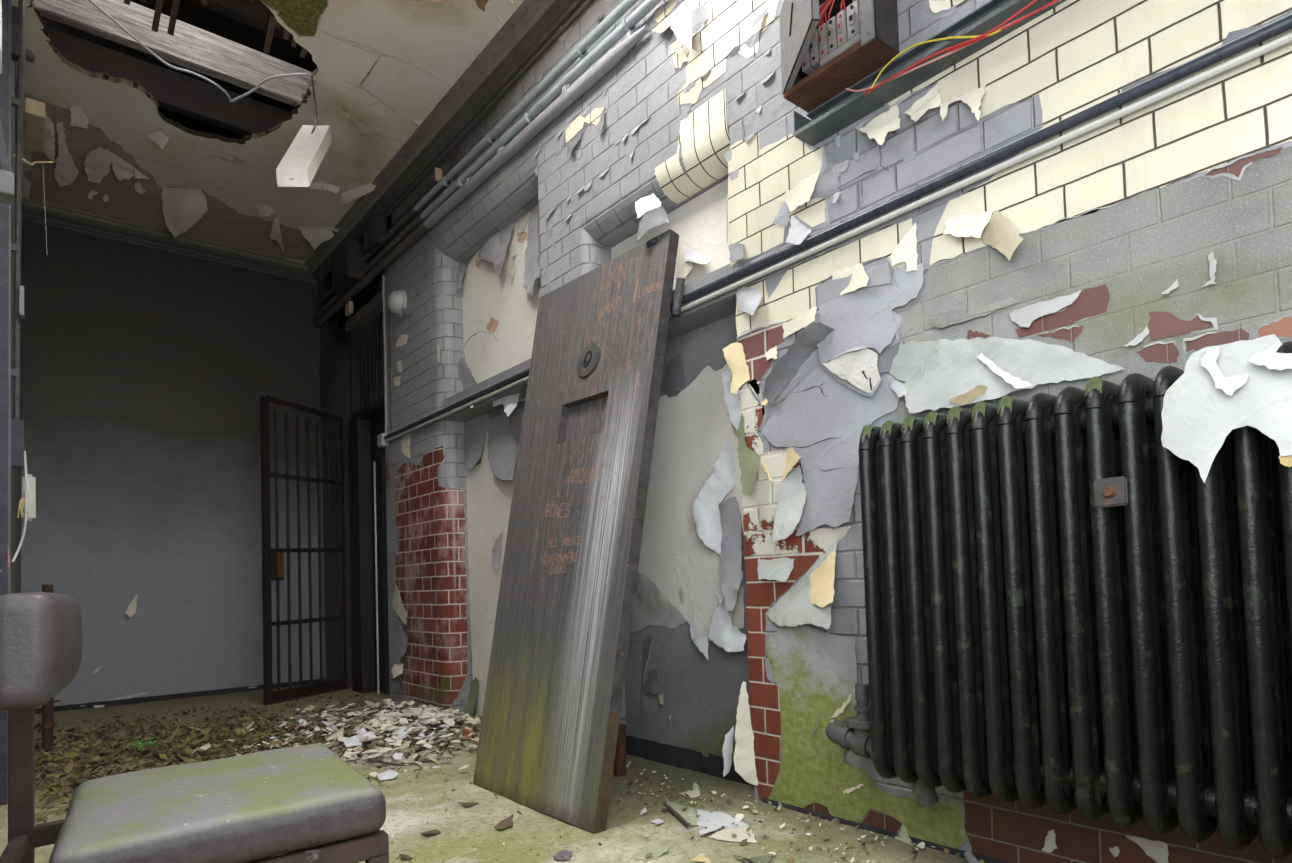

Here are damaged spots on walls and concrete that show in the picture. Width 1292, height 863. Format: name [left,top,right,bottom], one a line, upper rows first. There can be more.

flaking render [22,101,339,261]
peeling [309,181,376,205]
peeling [534,90,650,176]
peeling [455,168,609,390]
peeling [393,333,408,387]
peeling [611,0,1292,801]
peeling [391,393,526,717]